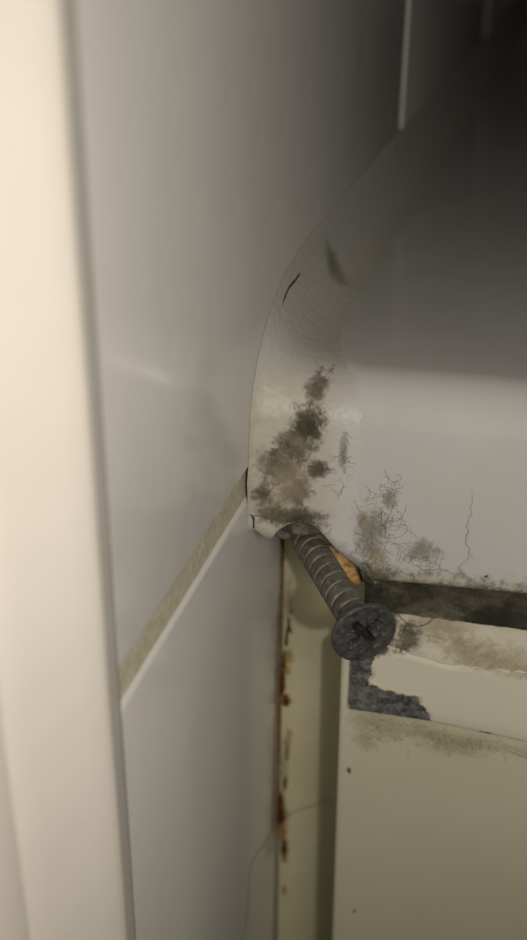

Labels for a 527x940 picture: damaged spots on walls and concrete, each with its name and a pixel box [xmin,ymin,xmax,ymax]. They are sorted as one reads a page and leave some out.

water stain [254,360,334,527]
corrosion [273,546,292,861]
peeling [349,656,433,721]